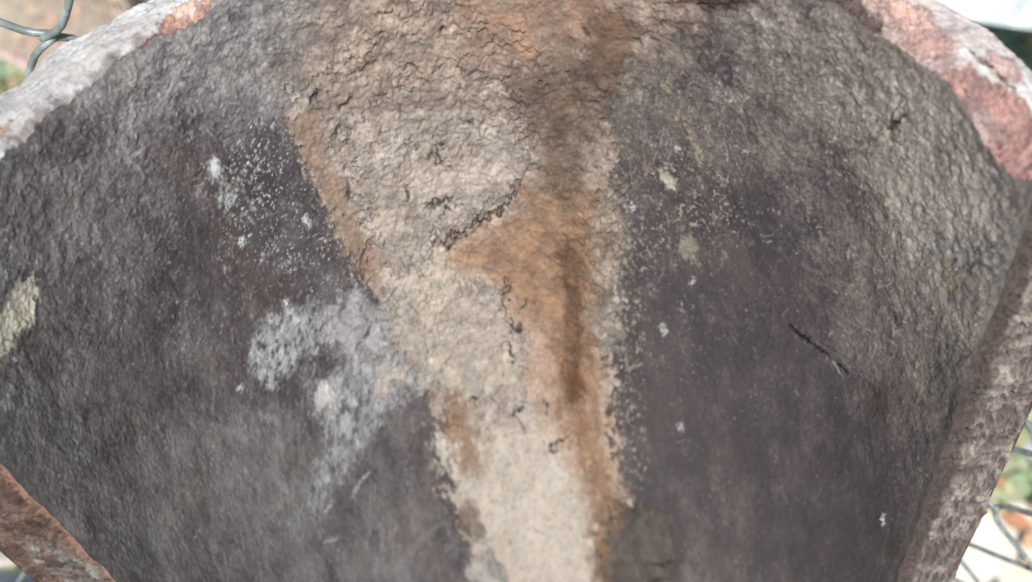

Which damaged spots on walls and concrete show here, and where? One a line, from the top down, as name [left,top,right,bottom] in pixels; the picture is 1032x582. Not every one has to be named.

crack [428,185,520,250]
corrosion [452,0,642,582]
efflorescence [219,284,425,579]
corrosion [445,401,479,473]
spalling [0,464,116,582]